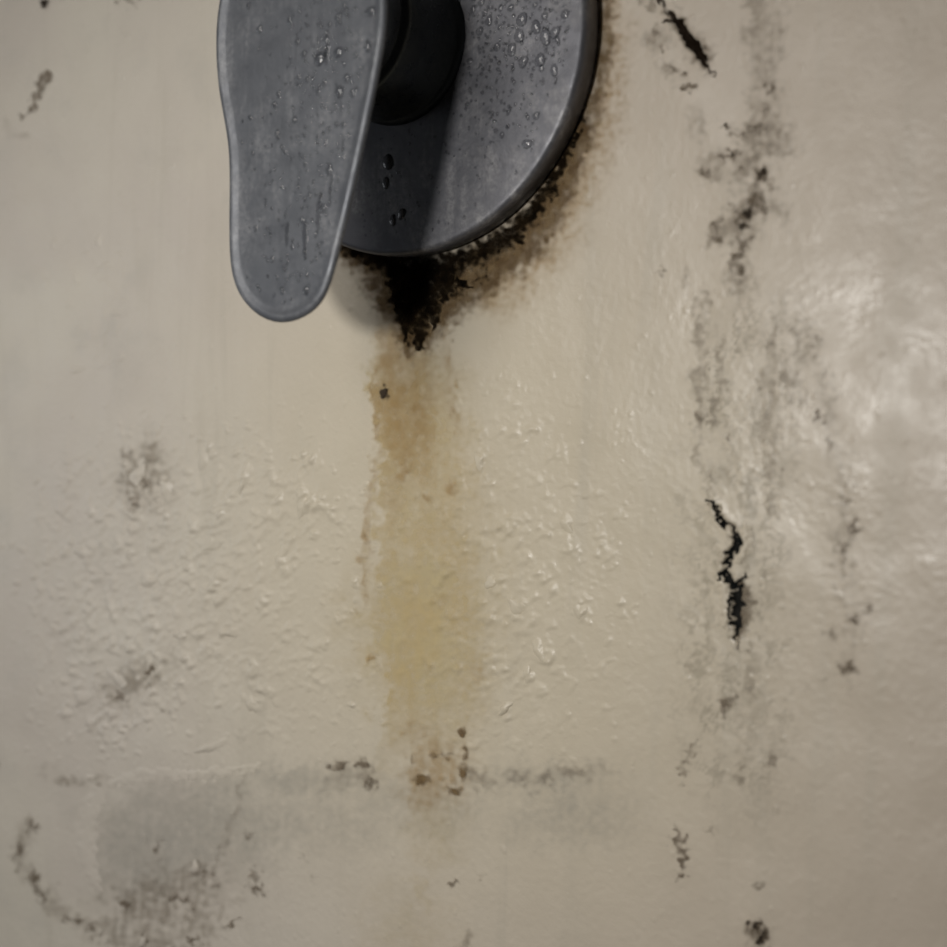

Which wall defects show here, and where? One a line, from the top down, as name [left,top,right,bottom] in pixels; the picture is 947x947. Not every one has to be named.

crack [656,0,716,77]
mould [340,11,612,358]
mould [739,194,764,229]
crack [705,499,756,648]
mould [746,921,768,944]